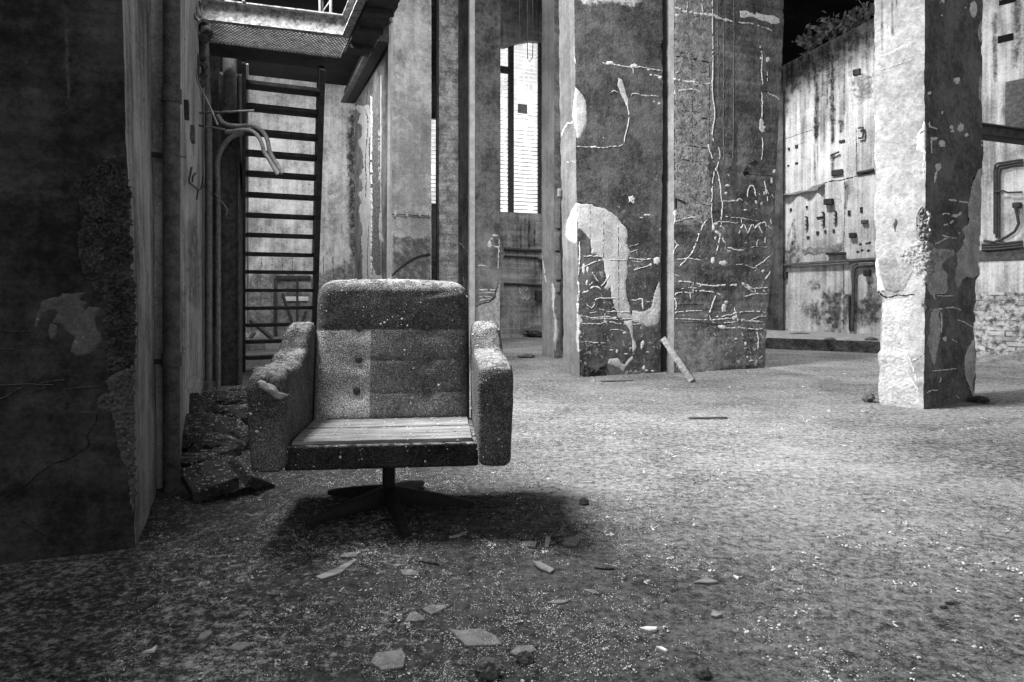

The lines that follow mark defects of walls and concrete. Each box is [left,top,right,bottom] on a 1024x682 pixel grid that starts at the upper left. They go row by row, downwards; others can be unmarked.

flaking render [965,1,982,42]
water stain [249,111,355,332]
flaking render [561,88,587,138]
flaking render [602,0,780,362]
water stain [786,40,854,170]
flaking render [916,121,968,183]
flaking render [0,154,138,512]
flaking render [565,202,661,372]
crack [677,304,730,325]
water stain [801,266,882,332]
flaking render [856,168,983,407]